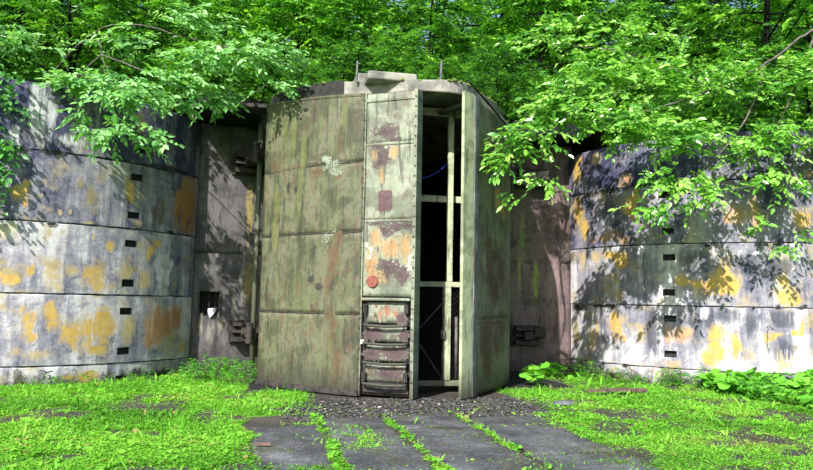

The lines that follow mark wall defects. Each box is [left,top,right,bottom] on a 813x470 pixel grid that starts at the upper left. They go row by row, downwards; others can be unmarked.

rust [371,140,401,189]
water stain [571,150,640,299]
water stain [790,205,813,235]
rust [138,297,185,359]
rust [377,301,400,325]
water stain [571,237,813,382]